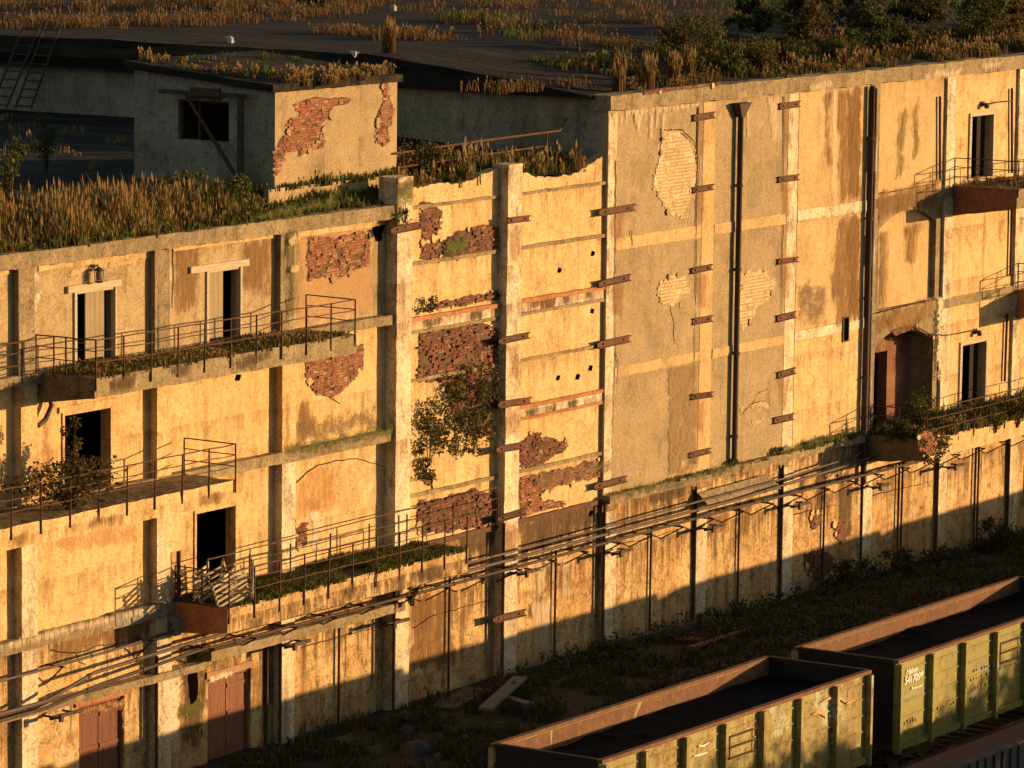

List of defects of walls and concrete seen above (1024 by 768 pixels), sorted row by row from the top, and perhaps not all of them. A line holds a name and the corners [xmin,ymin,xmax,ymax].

flaking render [272,97,353,176]
damp [810,80,863,201]
damp [897,104,918,175]
flaking render [289,225,385,322]
flaking render [420,201,501,263]
peeling [740,269,777,330]
damp [799,215,861,325]
flaking render [305,344,365,398]
flaking render [416,322,499,439]
crack [296,458,383,483]
flaking render [415,472,497,536]
flaking render [518,431,601,518]